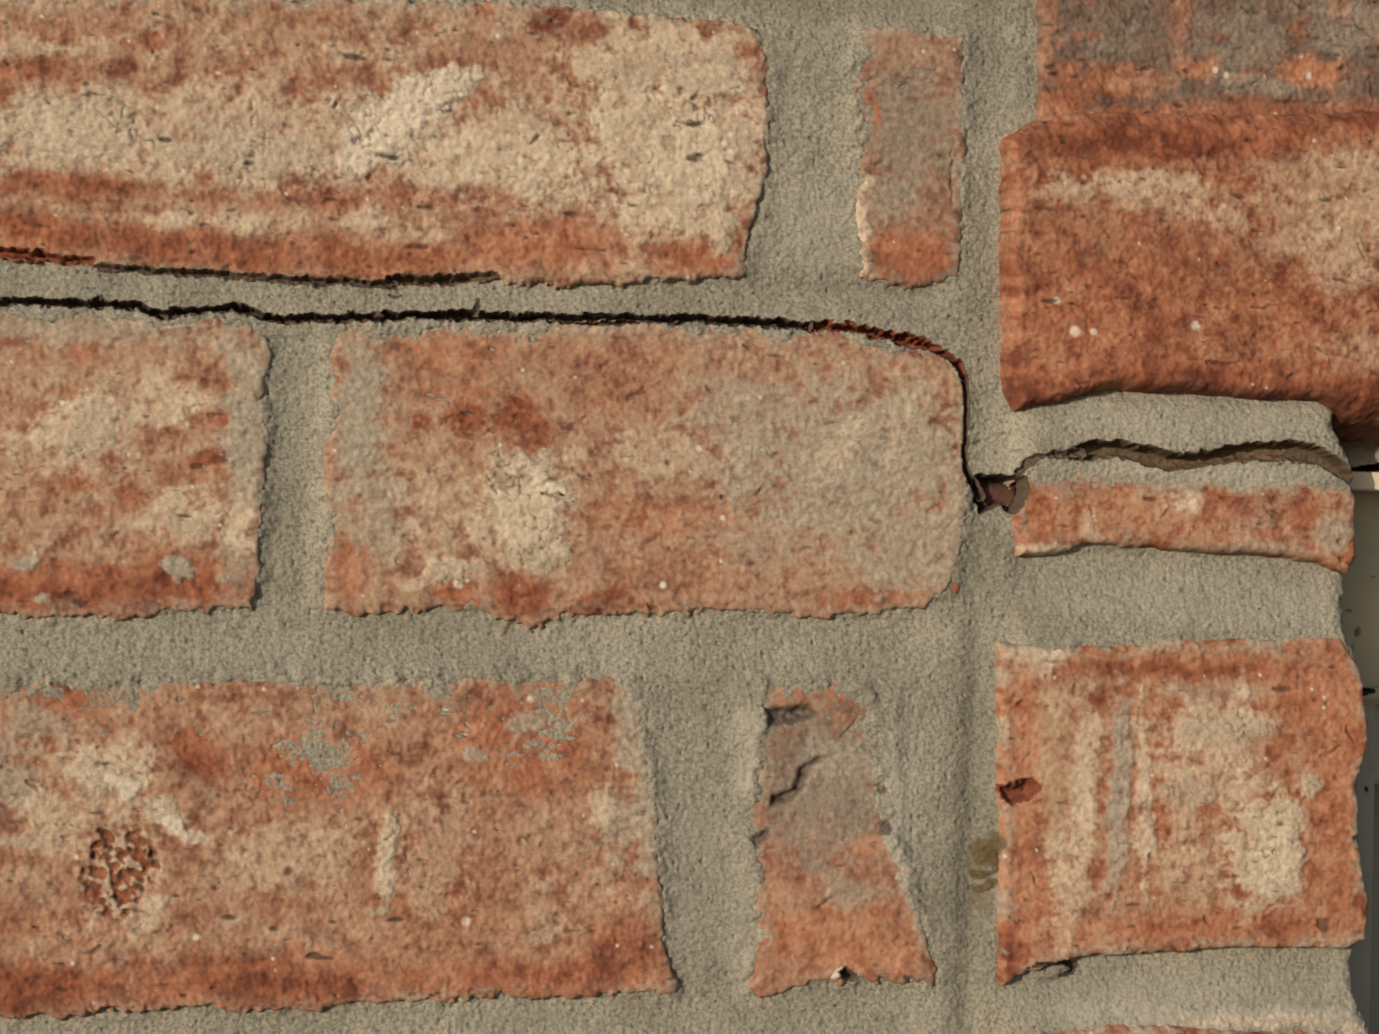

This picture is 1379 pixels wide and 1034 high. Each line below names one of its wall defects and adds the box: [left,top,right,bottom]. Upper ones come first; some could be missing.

crack [0,246,985,502]
crack [1014,438,1379,492]
spalling [67,754,193,921]
spalling [995,777,1042,806]